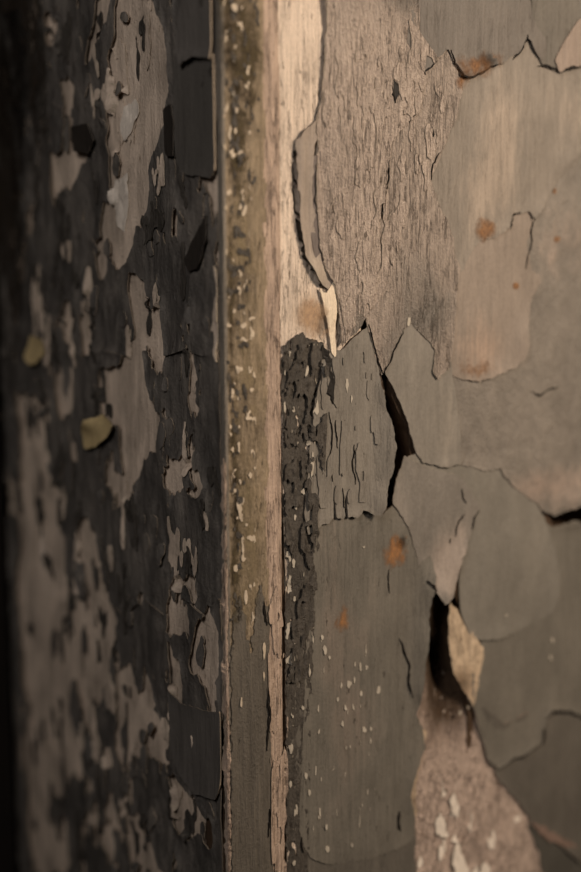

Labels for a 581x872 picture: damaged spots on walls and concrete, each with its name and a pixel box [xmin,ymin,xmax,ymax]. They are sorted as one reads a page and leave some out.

crack [420,35,529,78]
crack [537,64,581,72]
crack [292,144,324,291]
crack [381,160,390,219]
crack [510,212,536,269]
crack [369,325,404,375]
peeling [0,0,283,872]
crack [318,345,356,508]
peeling [270,0,581,872]
crack [449,488,480,544]
crack [399,639,413,698]
crack [500,710,581,769]